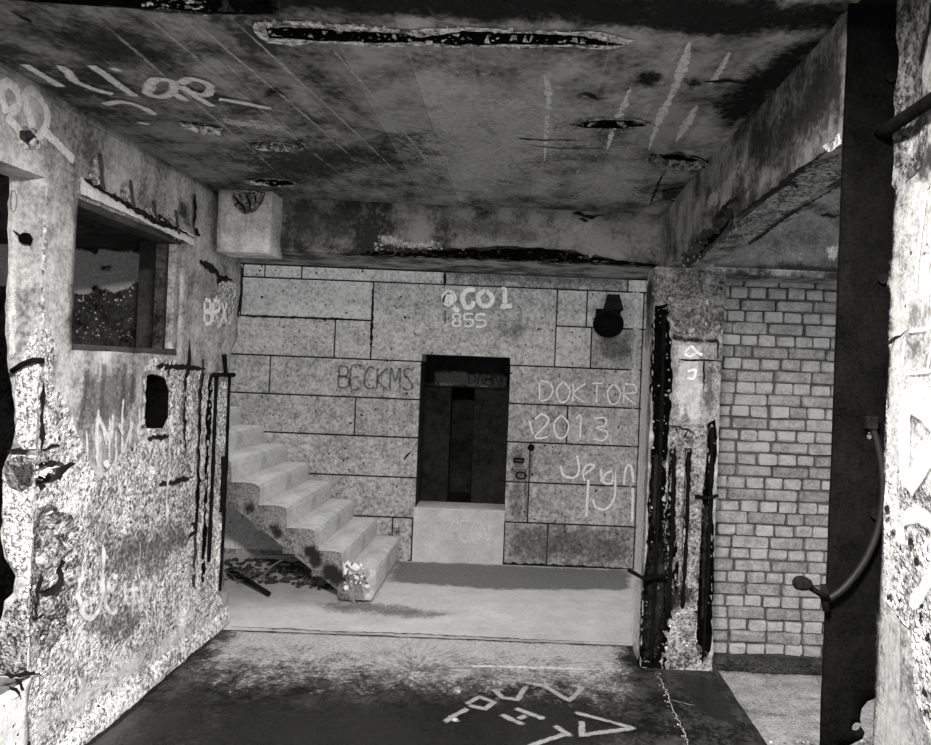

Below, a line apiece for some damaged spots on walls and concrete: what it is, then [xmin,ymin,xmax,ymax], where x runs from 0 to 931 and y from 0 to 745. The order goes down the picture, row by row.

spalling [20,0,635,50]
spalling [564,117,652,132]
spalling [211,280,236,329]
spalling [338,134,842,671]
flaking render [0,181,228,745]
crack [655,673,691,745]